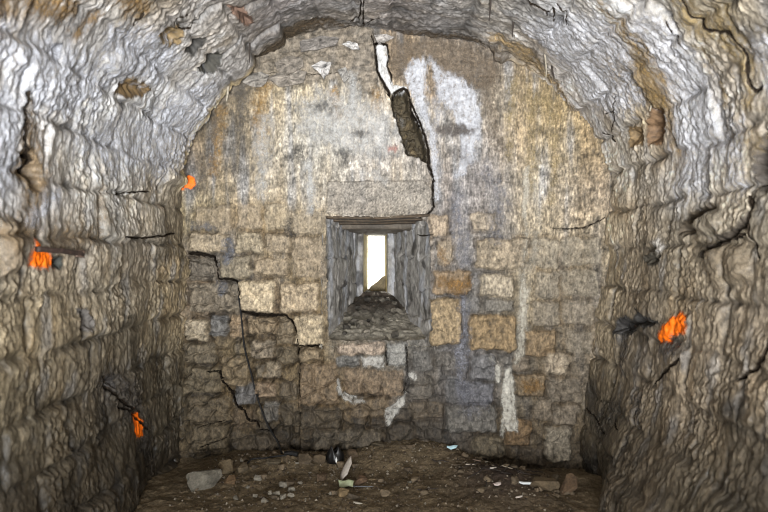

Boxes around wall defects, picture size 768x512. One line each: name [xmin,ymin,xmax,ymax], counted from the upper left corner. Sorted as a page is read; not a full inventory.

damp [232,16,343,173]
flaking render [243,36,360,107]
crack [350,0,435,214]
peeling [374,34,480,200]
damp [393,30,509,118]
crack [681,0,763,93]
crack [207,370,273,431]
crack [188,251,320,400]
damp [495,274,528,436]